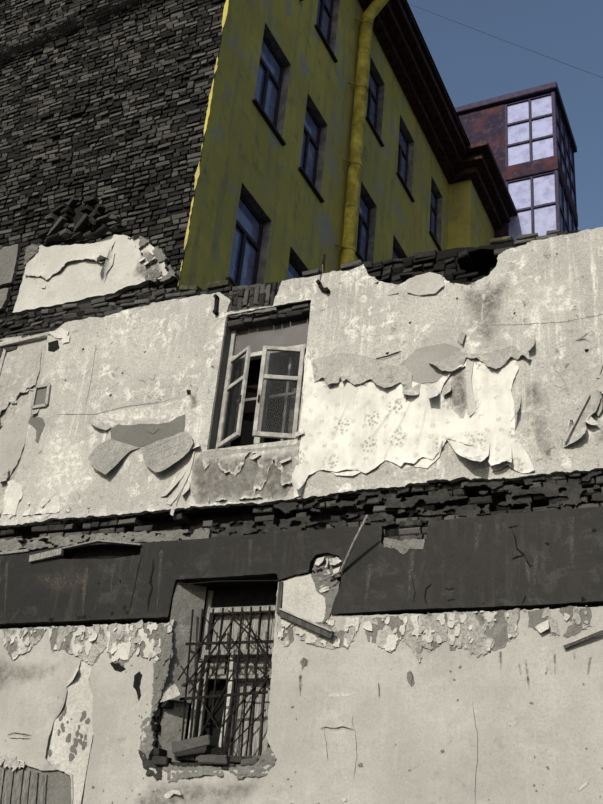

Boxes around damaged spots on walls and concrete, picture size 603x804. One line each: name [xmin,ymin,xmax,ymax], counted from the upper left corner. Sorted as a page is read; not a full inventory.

spalling [23,244,39,267]
flaking render [363,249,495,296]
peeling [0,328,71,519]
flaking render [0,407,603,554]
flaking render [276,555,592,662]
flaking render [0,612,277,798]
crack [323,715,357,779]
crack [471,711,479,802]